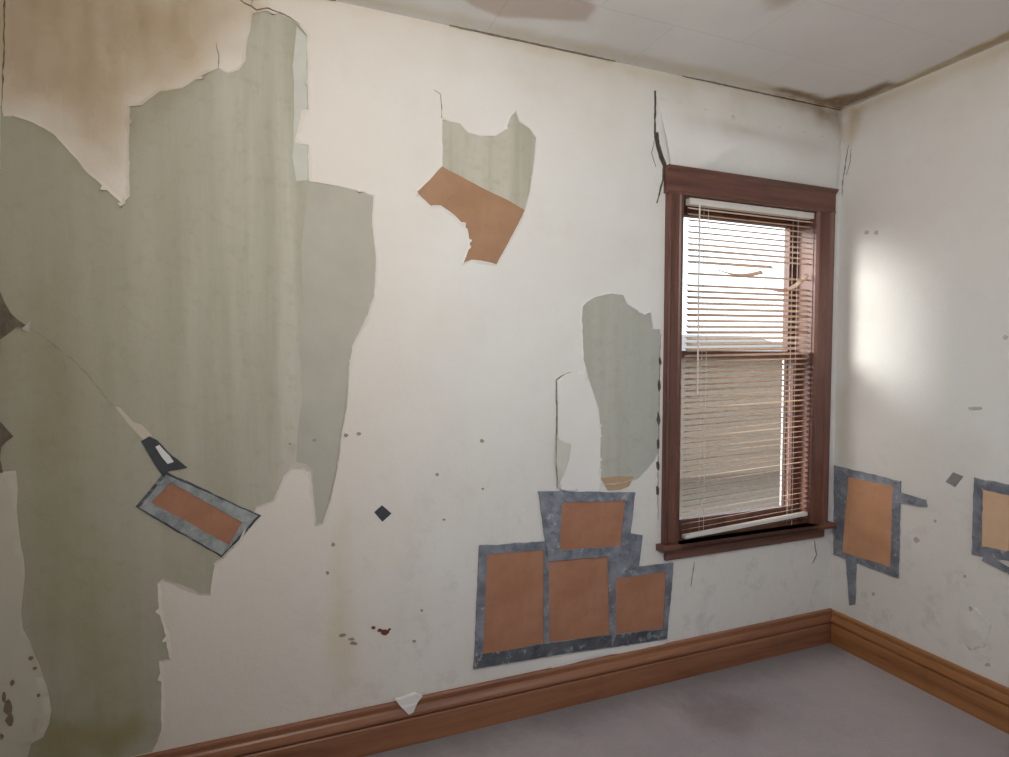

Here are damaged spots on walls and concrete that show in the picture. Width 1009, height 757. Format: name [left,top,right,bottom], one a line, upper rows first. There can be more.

flaking render [435,112,536,209]
crack [651,90,667,203]
flaking render [0,11,376,757]
flaking render [582,294,660,479]